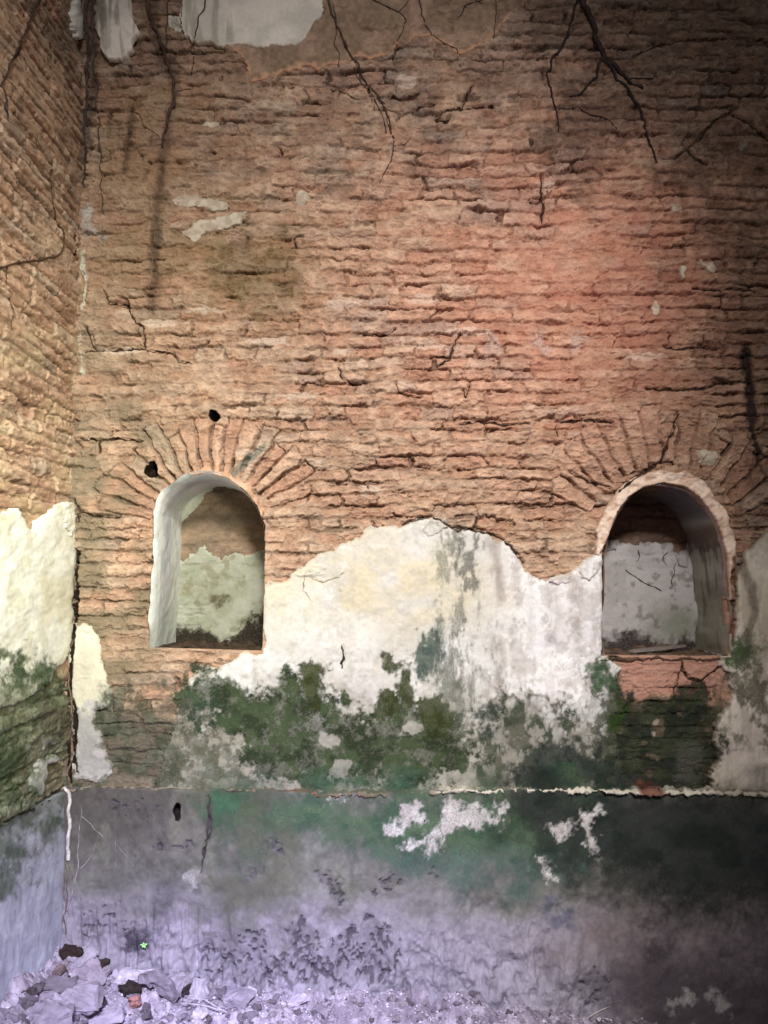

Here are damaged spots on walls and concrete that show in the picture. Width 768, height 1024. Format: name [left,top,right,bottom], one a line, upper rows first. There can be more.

peeling [68,0,140,63]
peeling [168,0,528,84]
crack [529,178,545,229]
crack [85,297,192,364]
crack [569,383,732,493]
peeling [181,487,233,522]
water stain [9,649,268,790]
water stain [374,652,456,743]
peeling [156,517,698,792]
water stain [471,658,628,789]
crack [673,662,722,699]
water stain [383,796,510,855]